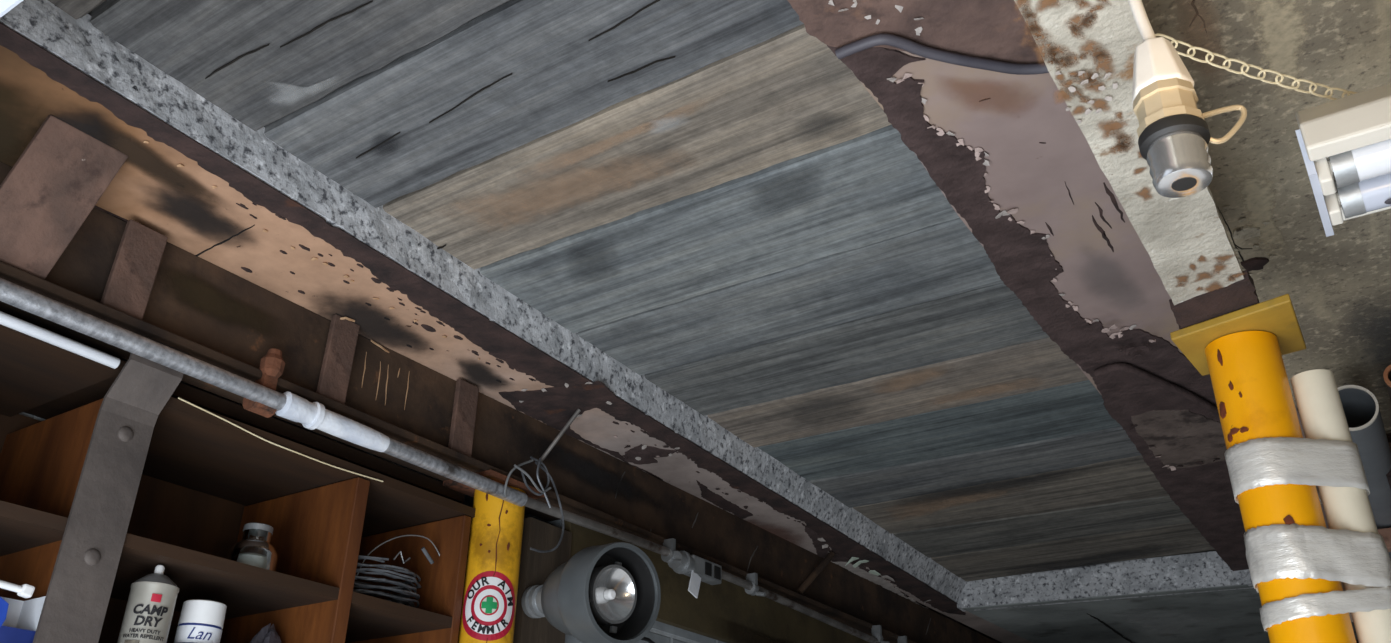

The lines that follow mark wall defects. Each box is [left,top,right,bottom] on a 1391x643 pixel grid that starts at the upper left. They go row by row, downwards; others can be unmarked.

corrosion [1017,0,1151,200]
leakage [362,352,410,410]
peeling [0,22,1002,643]
peeling [788,0,1249,571]
corrosion [1176,255,1244,292]
spalling [1238,255,1276,276]